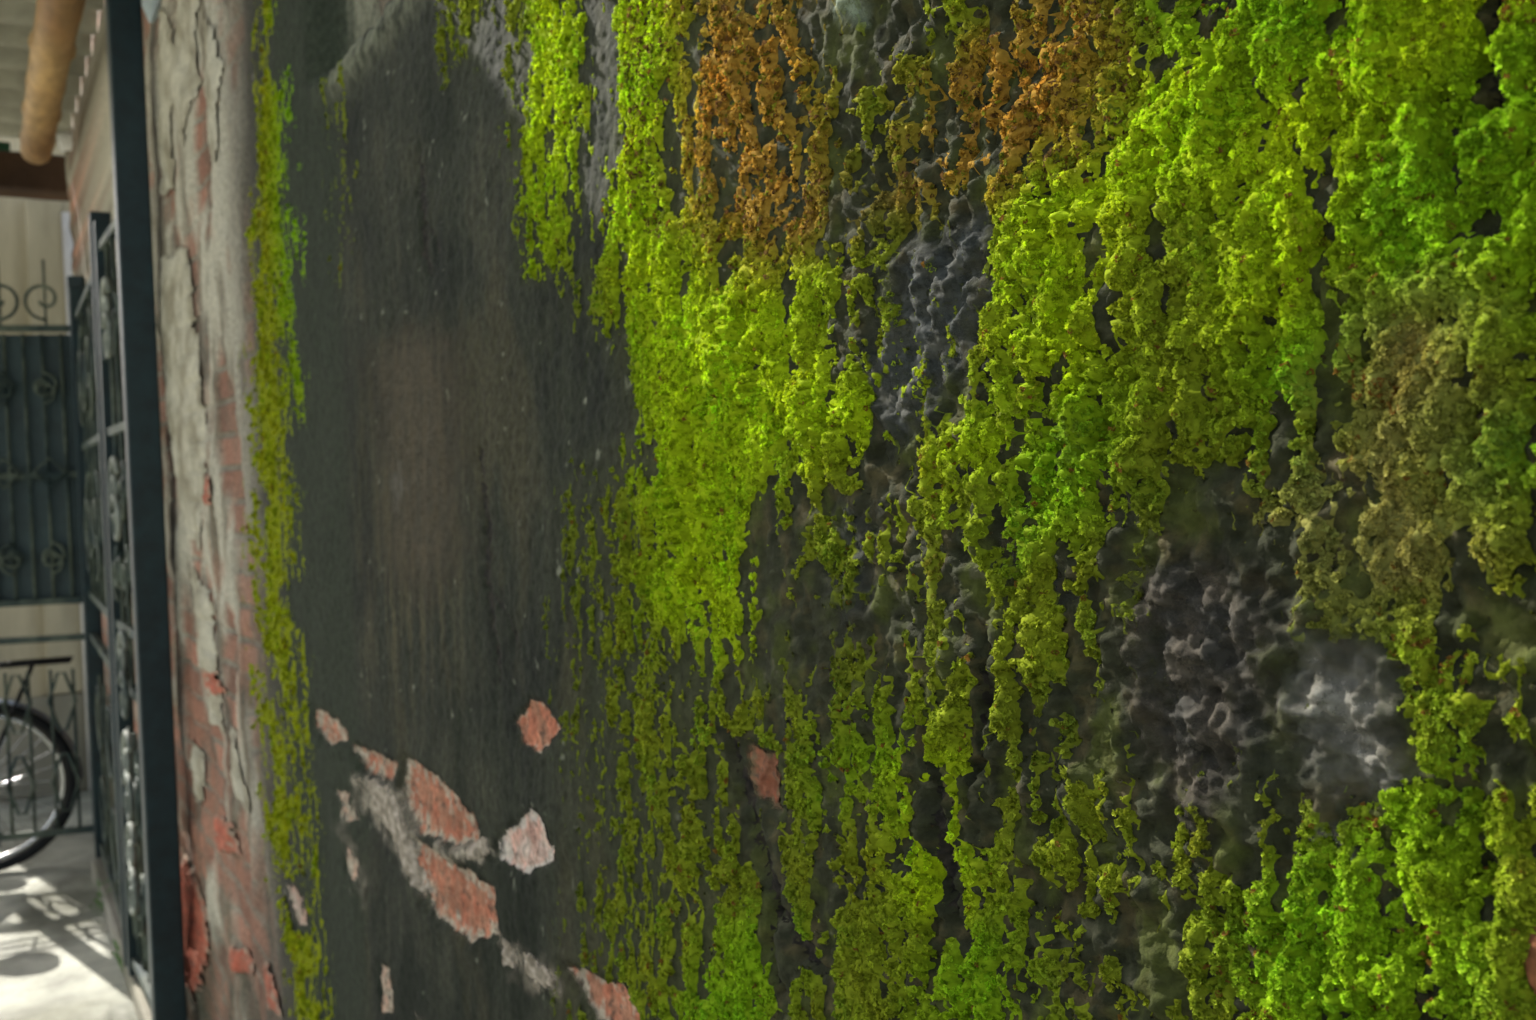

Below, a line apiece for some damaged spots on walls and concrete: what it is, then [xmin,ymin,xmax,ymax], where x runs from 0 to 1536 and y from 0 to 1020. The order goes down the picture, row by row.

peeling [157,0,224,197]
peeling [157,246,249,856]
spalling [517,700,561,754]
spalling [180,845,210,1003]
spalling [229,944,281,1018]
spalling [287,885,307,926]
spalling [316,709,640,1020]